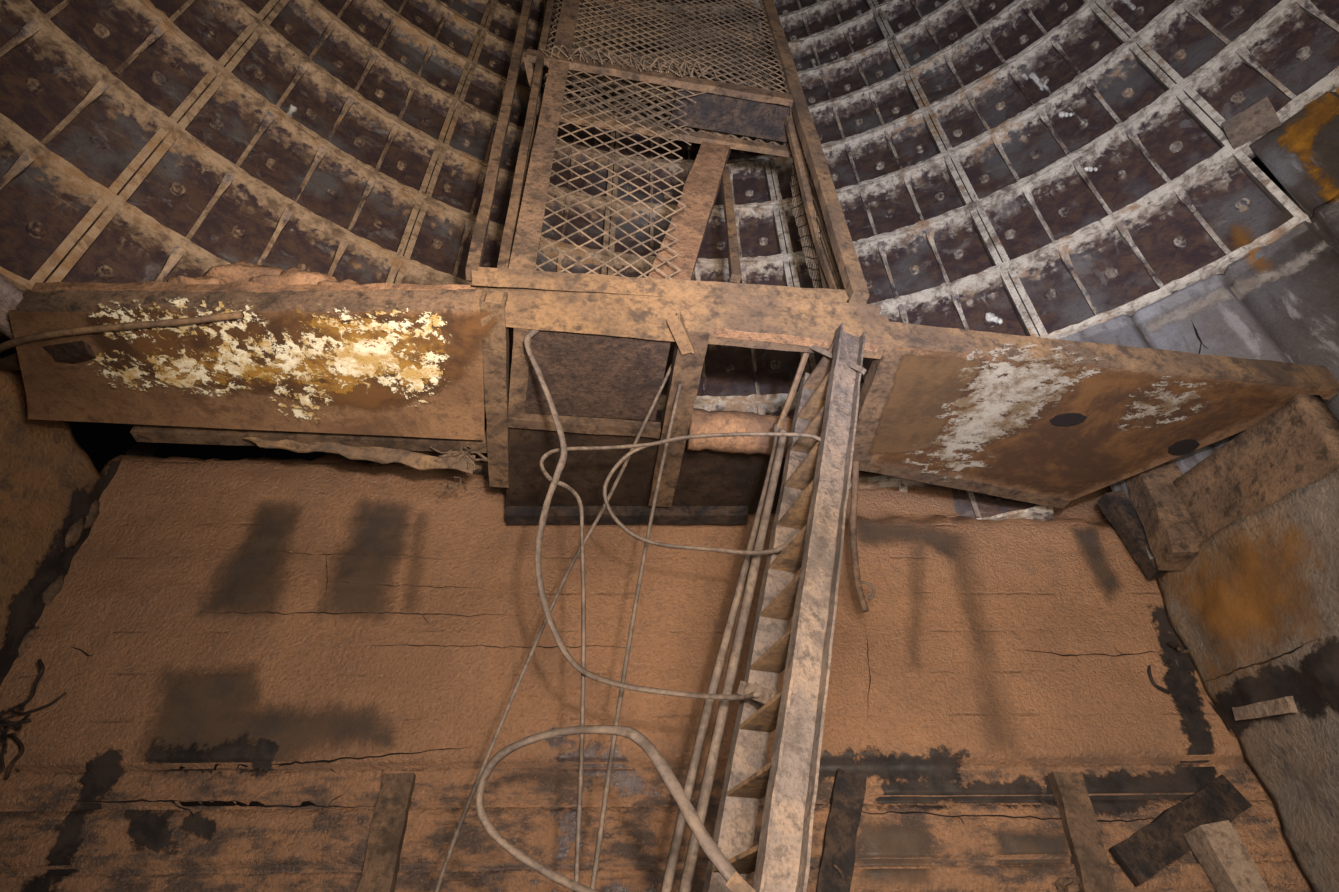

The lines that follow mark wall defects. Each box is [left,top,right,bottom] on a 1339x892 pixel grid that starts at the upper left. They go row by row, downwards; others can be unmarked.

rust [1278,88,1339,202]
peeling [88,298,449,422]